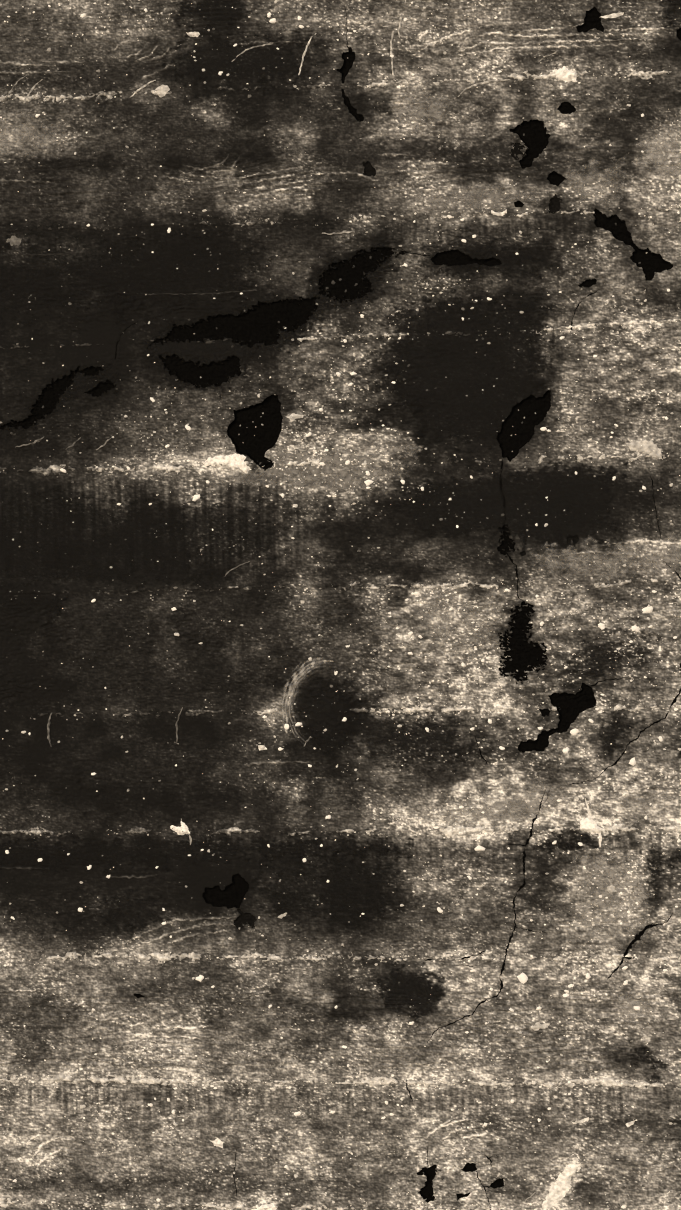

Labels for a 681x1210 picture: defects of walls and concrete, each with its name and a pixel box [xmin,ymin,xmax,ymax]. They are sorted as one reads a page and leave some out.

spalling [509,119,551,169]
damp [418,182,539,216]
spalling [593,208,673,281]
damp [0,231,397,398]
spalling [227,395,283,471]
damp [185,227,681,581]
spalling [496,390,551,462]
spalling [498,600,548,684]
spalling [518,683,597,753]
damp [0,821,414,934]
crack [425,663,681,1043]
spalling [417,1165,444,1203]